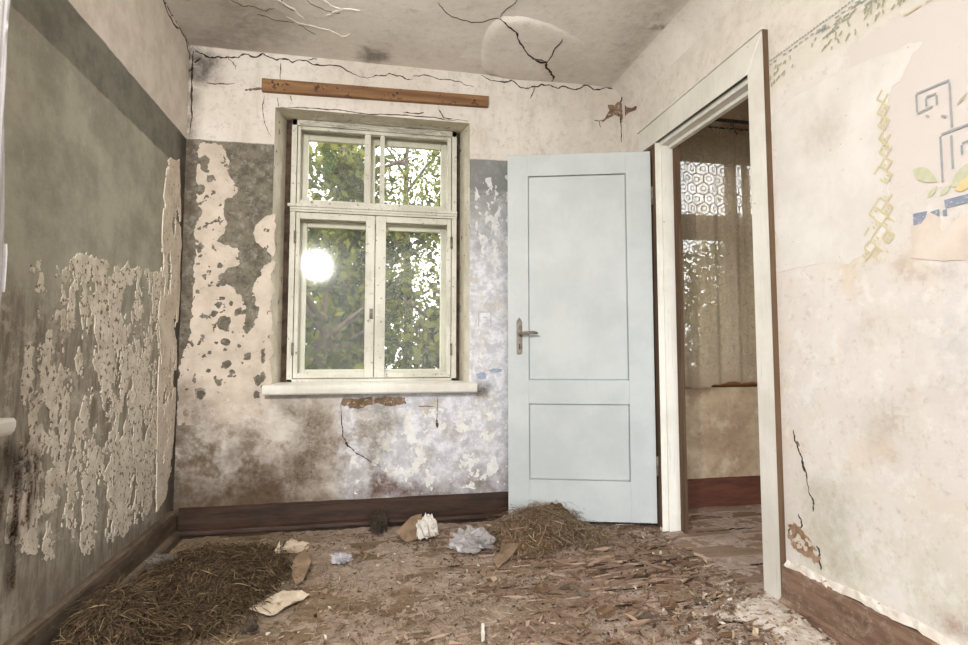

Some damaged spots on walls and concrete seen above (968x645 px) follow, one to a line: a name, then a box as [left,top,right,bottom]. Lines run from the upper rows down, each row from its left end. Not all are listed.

crack [163,0,623,142]
spalling [602,102,637,122]
peeling [771,42,923,273]
peeling [475,175,508,394]
peeling [909,213,968,262]
peeling [4,142,276,561]
crack [341,402,379,466]
peeling [341,396,508,494]
crack [788,430,815,534]
spalling [787,523,821,564]